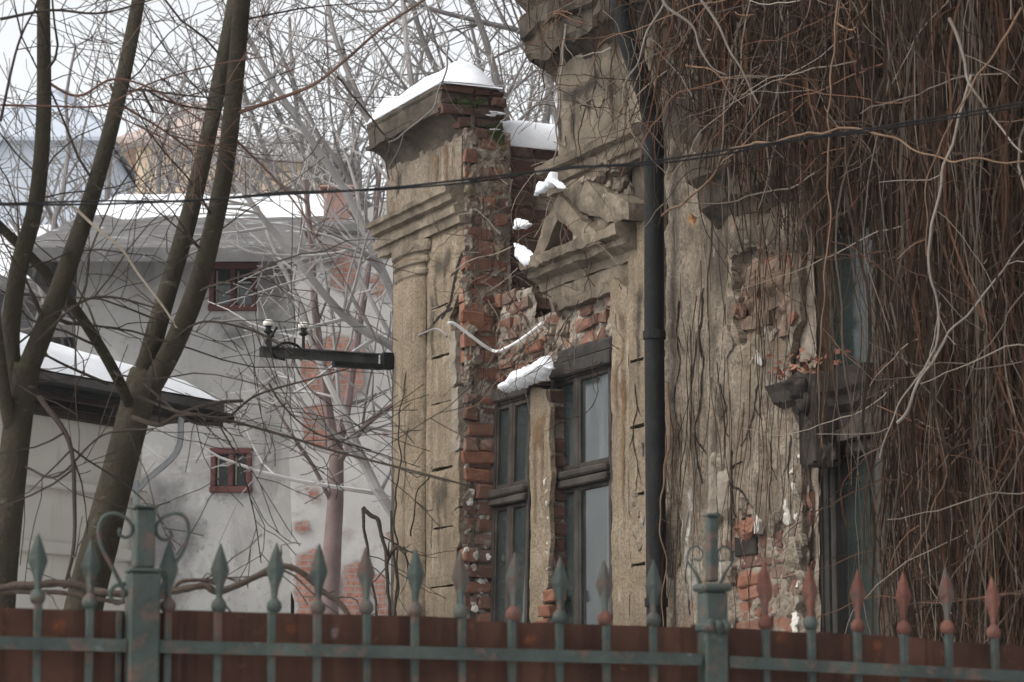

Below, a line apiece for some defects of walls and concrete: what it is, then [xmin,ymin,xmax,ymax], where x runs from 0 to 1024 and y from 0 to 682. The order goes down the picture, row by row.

spalling [722,240,799,366]
peeling [448,244,570,622]
flaking render [293,548,317,614]
flaking render [342,561,388,615]
flaking render [722,432,816,632]